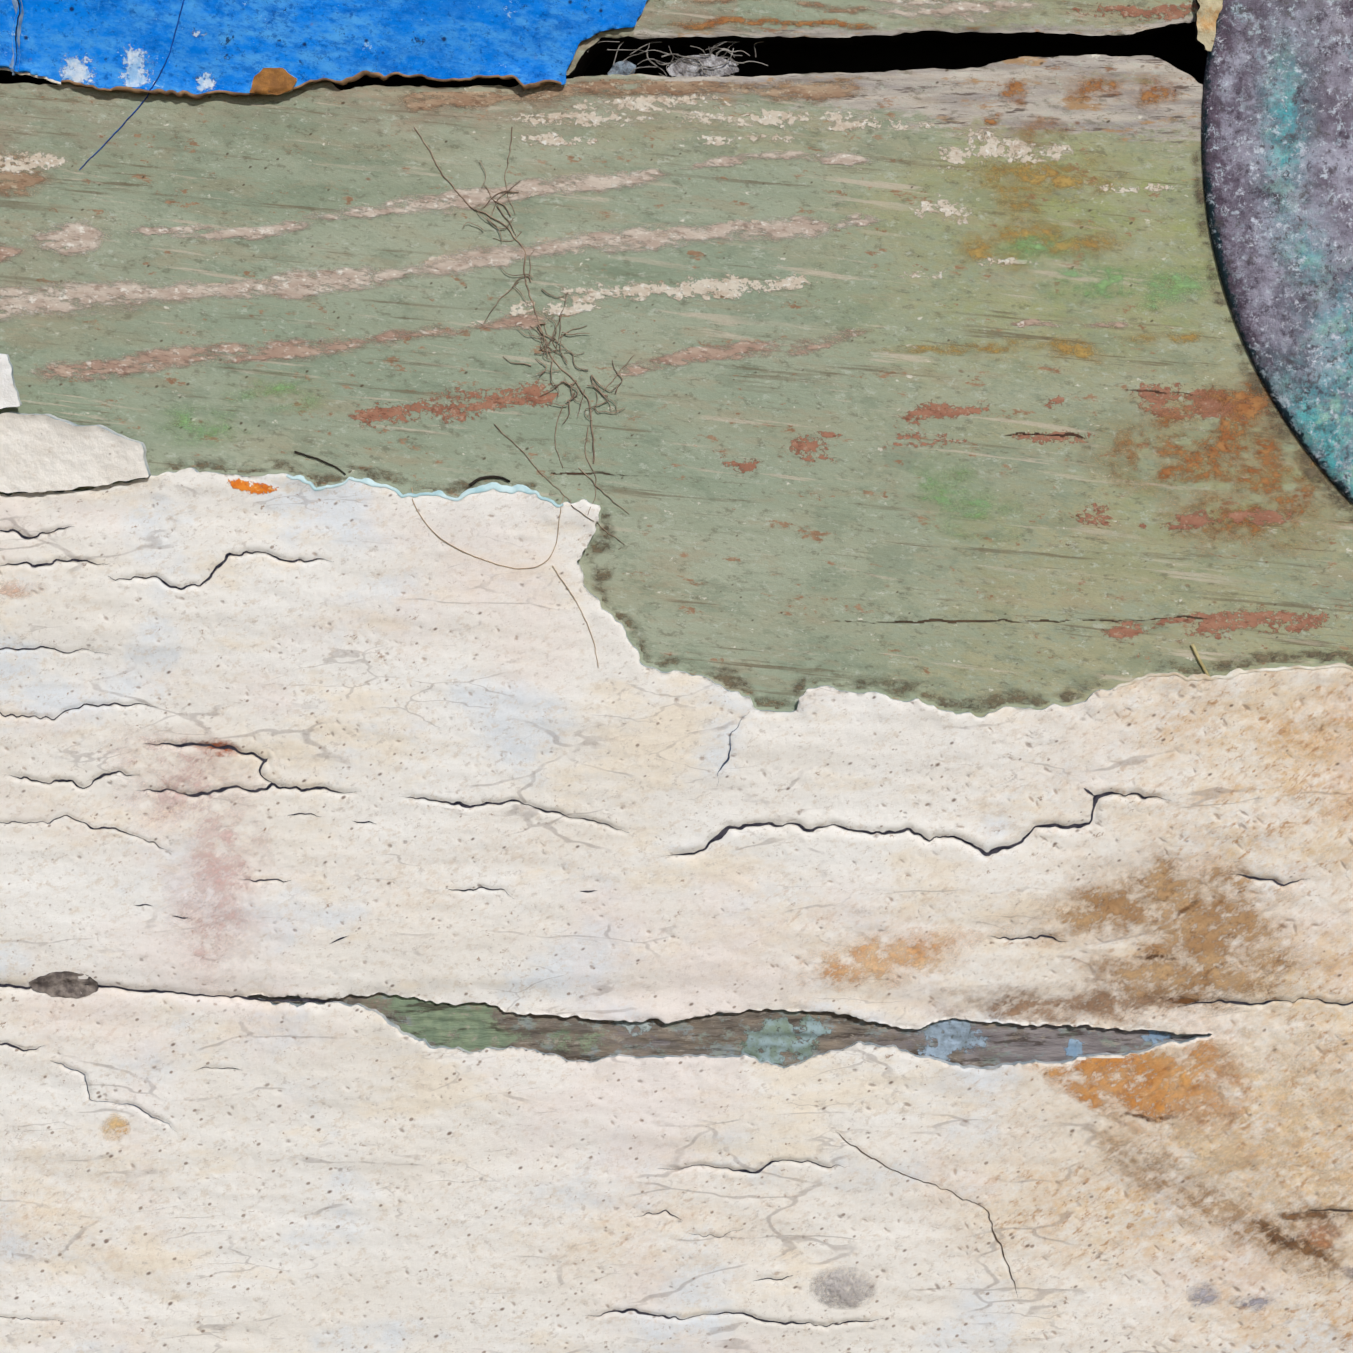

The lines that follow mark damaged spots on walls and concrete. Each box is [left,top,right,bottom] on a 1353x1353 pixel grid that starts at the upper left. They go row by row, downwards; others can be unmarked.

peeling [0,0,1176,266]
peeling [0,214,879,319]
peeling [33,274,810,381]
peeling [0,353,151,493]
crack [0,526,332,590]
crack [0,742,375,852]
crack [402,796,628,833]
crack [668,788,1171,856]
spalling [29,971,99,998]
crack [85,984,336,1002]
spalling [248,992,1209,1067]
crack [586,1308,883,1327]